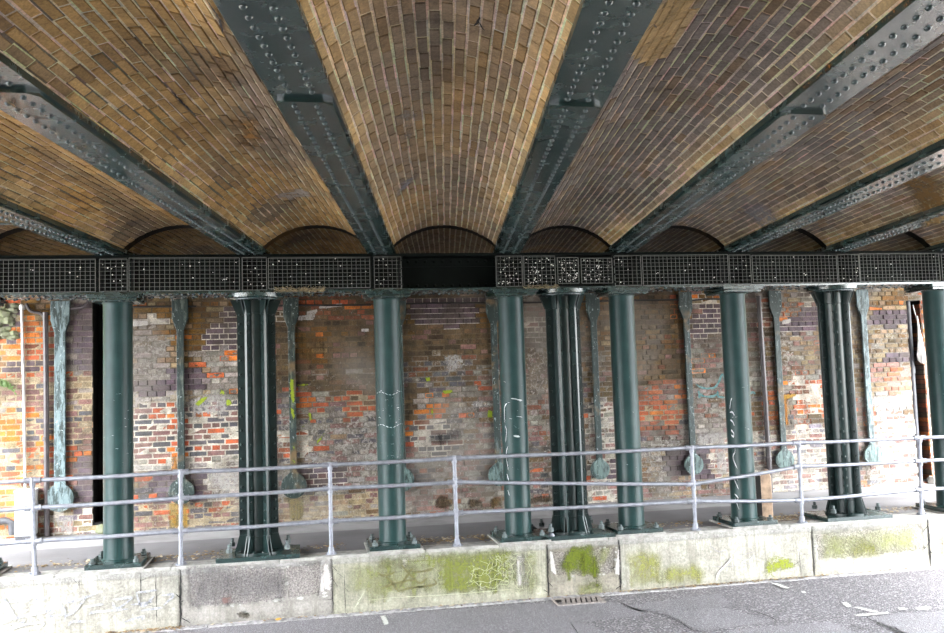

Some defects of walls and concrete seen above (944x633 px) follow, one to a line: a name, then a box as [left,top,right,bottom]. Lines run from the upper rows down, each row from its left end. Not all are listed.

leakage [515,551,530,586]
leakage [550,551,570,581]
leakage [582,554,597,593]